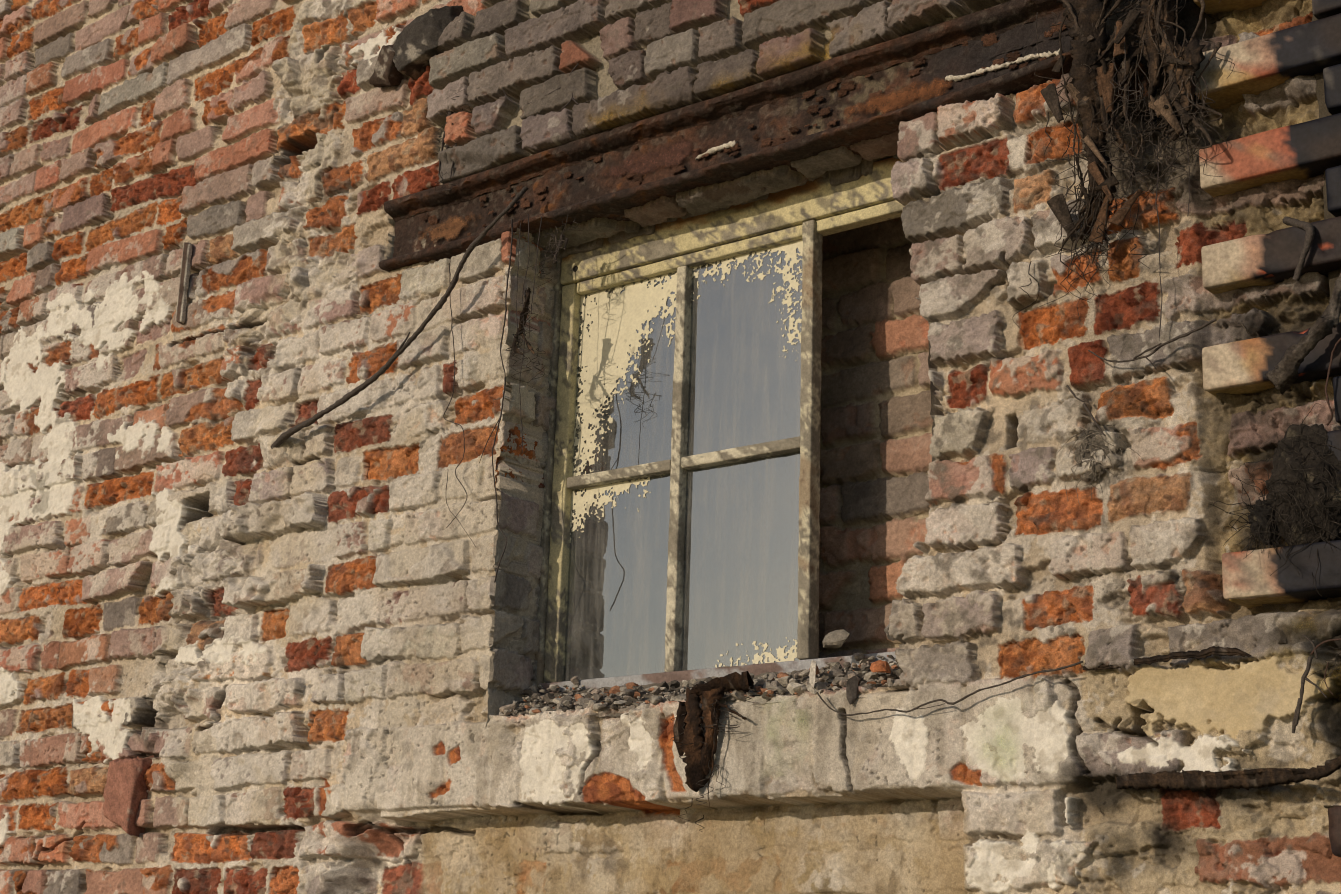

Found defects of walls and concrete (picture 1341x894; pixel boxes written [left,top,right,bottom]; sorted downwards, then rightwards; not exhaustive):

corrosion [961,33,1047,75]
spalling [195,0,464,258]
corrosion [747,56,955,147]
corrosion [418,185,547,241]
peeling [0,165,275,645]
spalling [296,400,319,425]
spalling [175,588,368,672]
spalling [0,667,156,846]
peeling [519,713,687,806]
peeling [1117,699,1245,772]
spalling [1161,788,1222,832]
spalling [12,870,37,894]